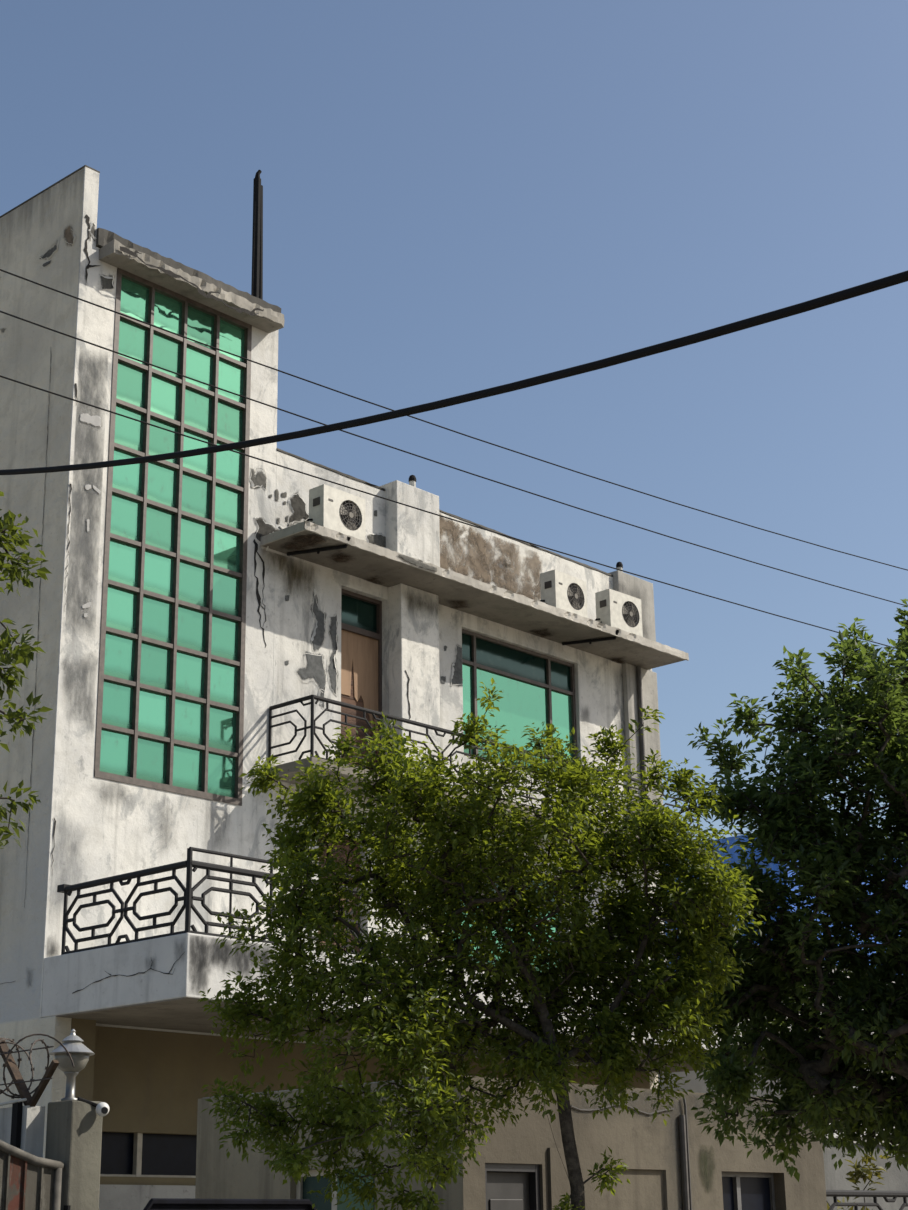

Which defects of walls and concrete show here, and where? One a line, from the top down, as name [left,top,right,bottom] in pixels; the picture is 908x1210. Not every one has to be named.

peeling [39,221,97,267]
peeling [99,275,114,292]
crack [84,214,272,322]
peeling [250,467,309,544]
crack [253,539,266,647]
peeling [285,589,338,709]
crack [72,952,185,994]